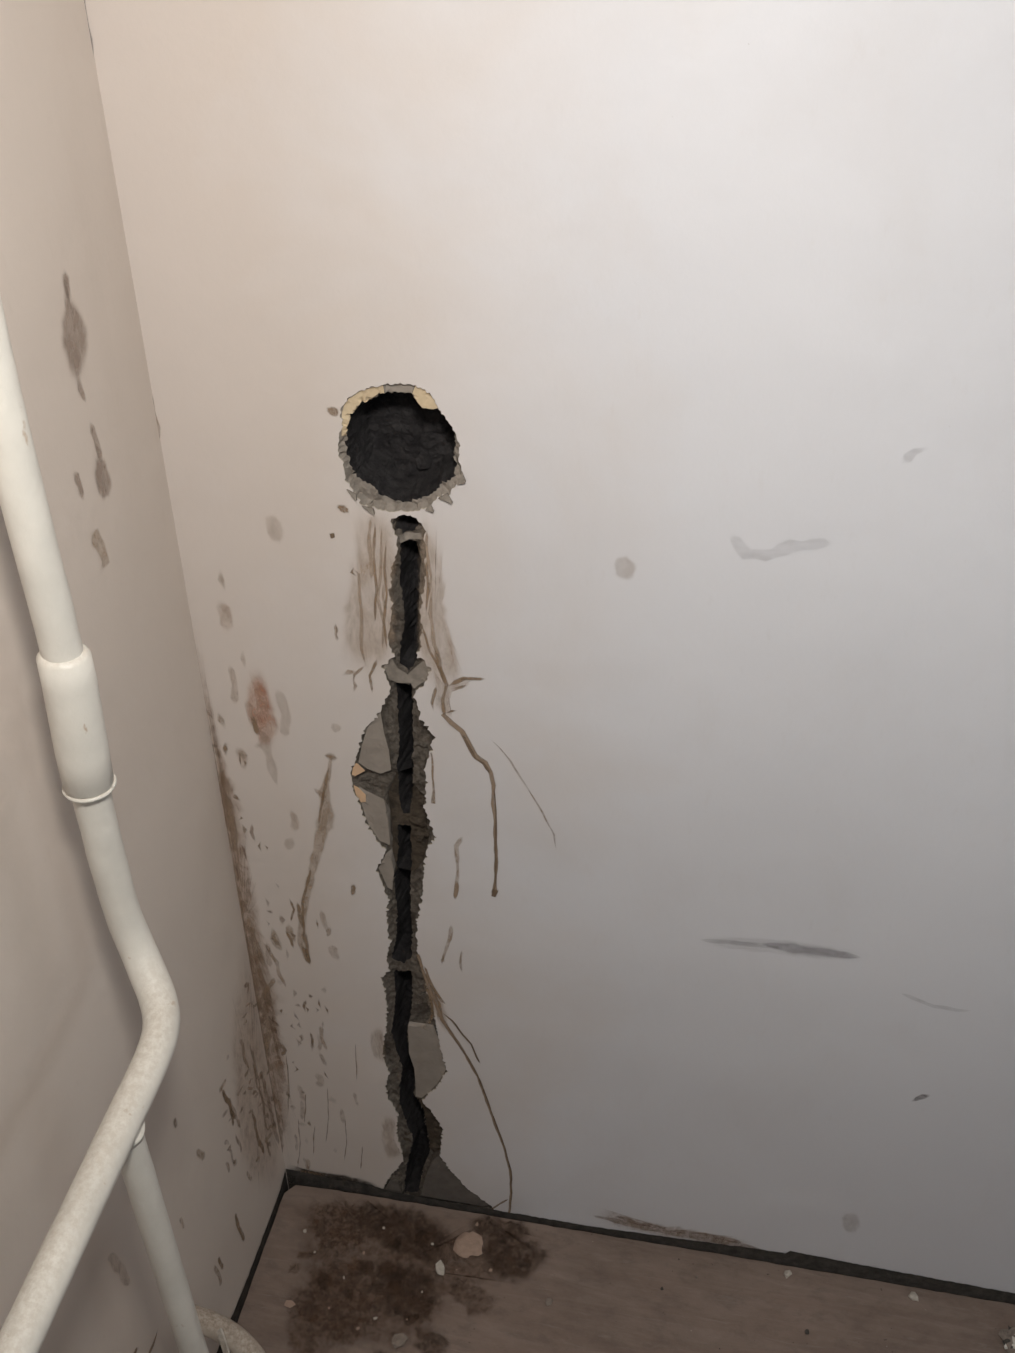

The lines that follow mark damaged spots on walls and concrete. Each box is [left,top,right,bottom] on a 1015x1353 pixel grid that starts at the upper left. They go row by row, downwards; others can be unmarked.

spalling [328,383,466,1192]
crack [442,713,555,897]
damp [221,755,334,1172]
damp [299,1123,369,1184]
crack [416,954,512,1213]